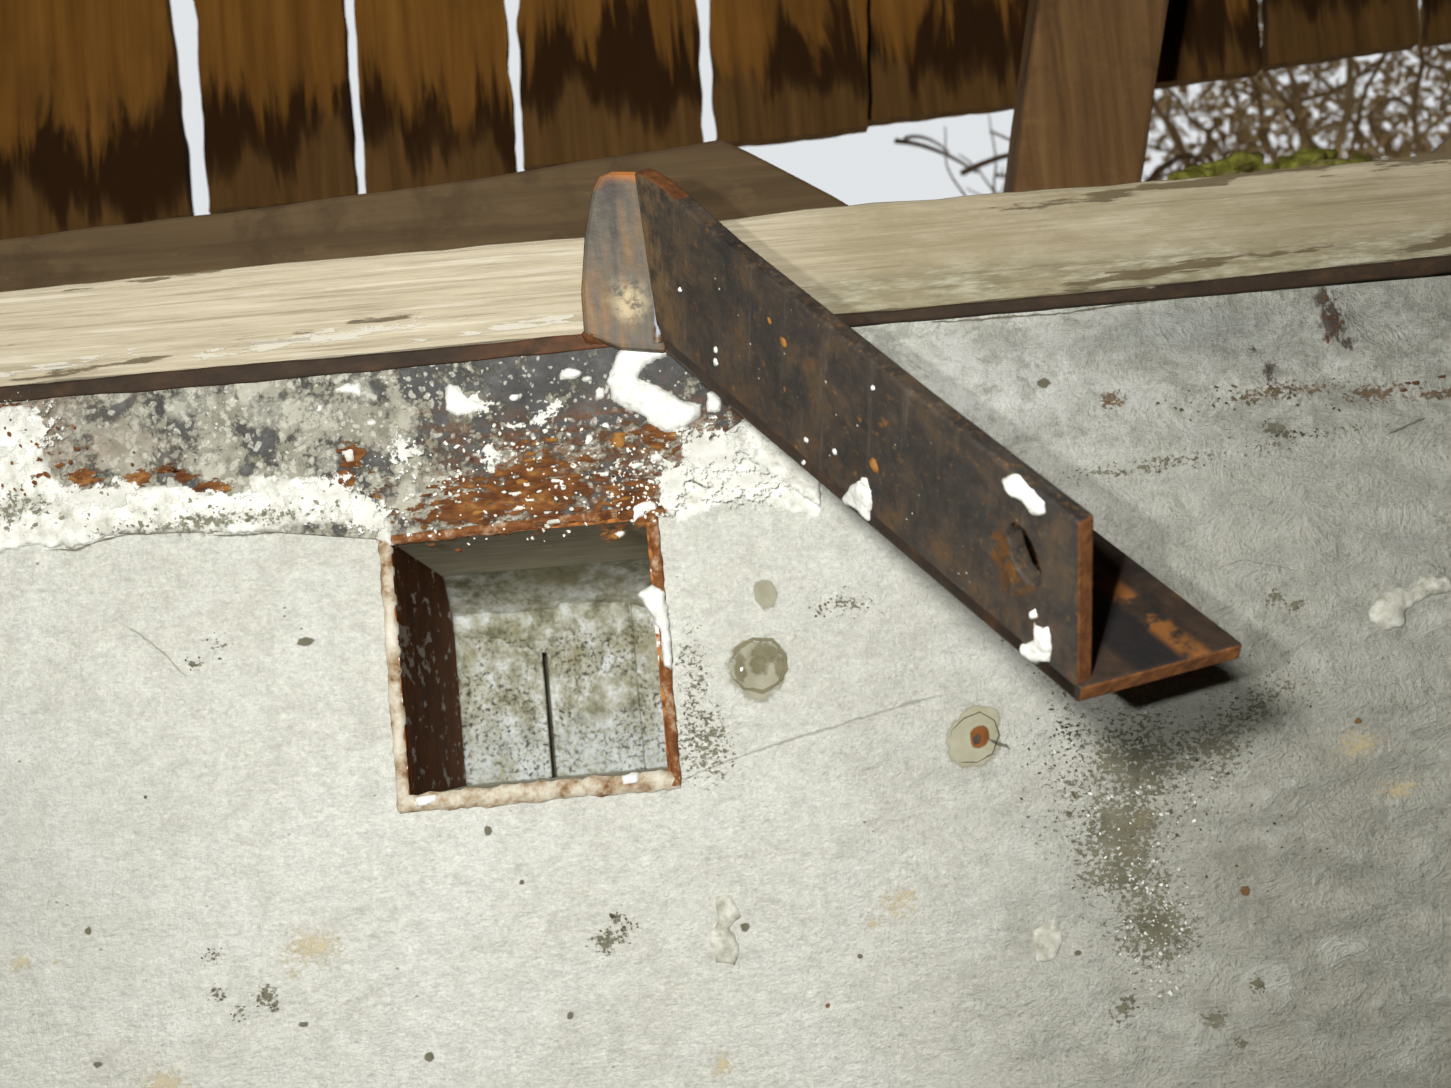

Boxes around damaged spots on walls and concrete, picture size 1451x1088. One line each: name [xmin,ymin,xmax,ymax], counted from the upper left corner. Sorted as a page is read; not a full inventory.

peeling [249,474,266,494]
peeling [342,449,354,462]
rust [324,412,686,552]
leakage [946,658,1342,1048]